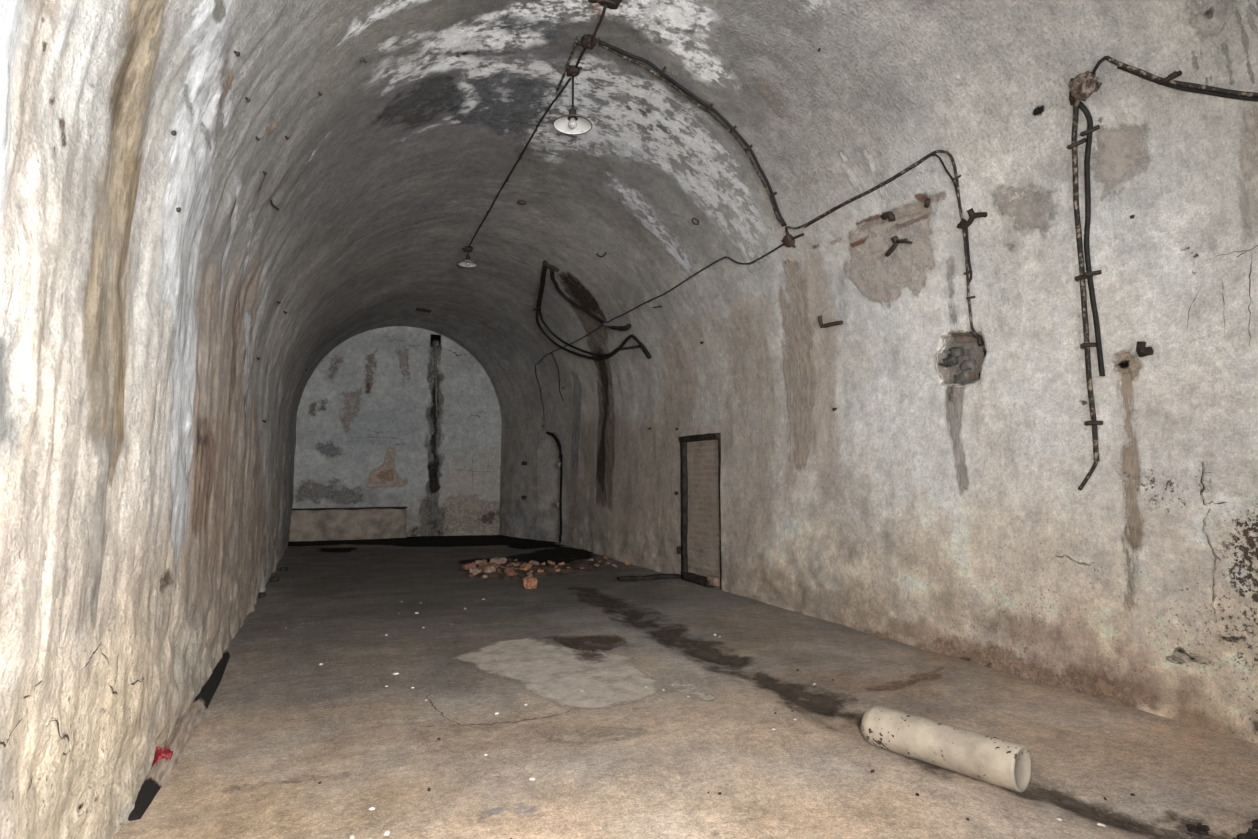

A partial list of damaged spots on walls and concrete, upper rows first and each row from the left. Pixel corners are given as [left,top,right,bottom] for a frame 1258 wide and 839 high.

water stain [342,0,427,42]
water stain [371,0,771,278]
water stain [83,0,168,629]
peeling [812,193,945,307]
spalling [934,330,987,387]
crack [1187,245,1258,347]
peeling [366,448,408,488]
water stain [1120,468,1185,512]
crack [1200,462,1227,623]
water stain [1211,510,1258,668]